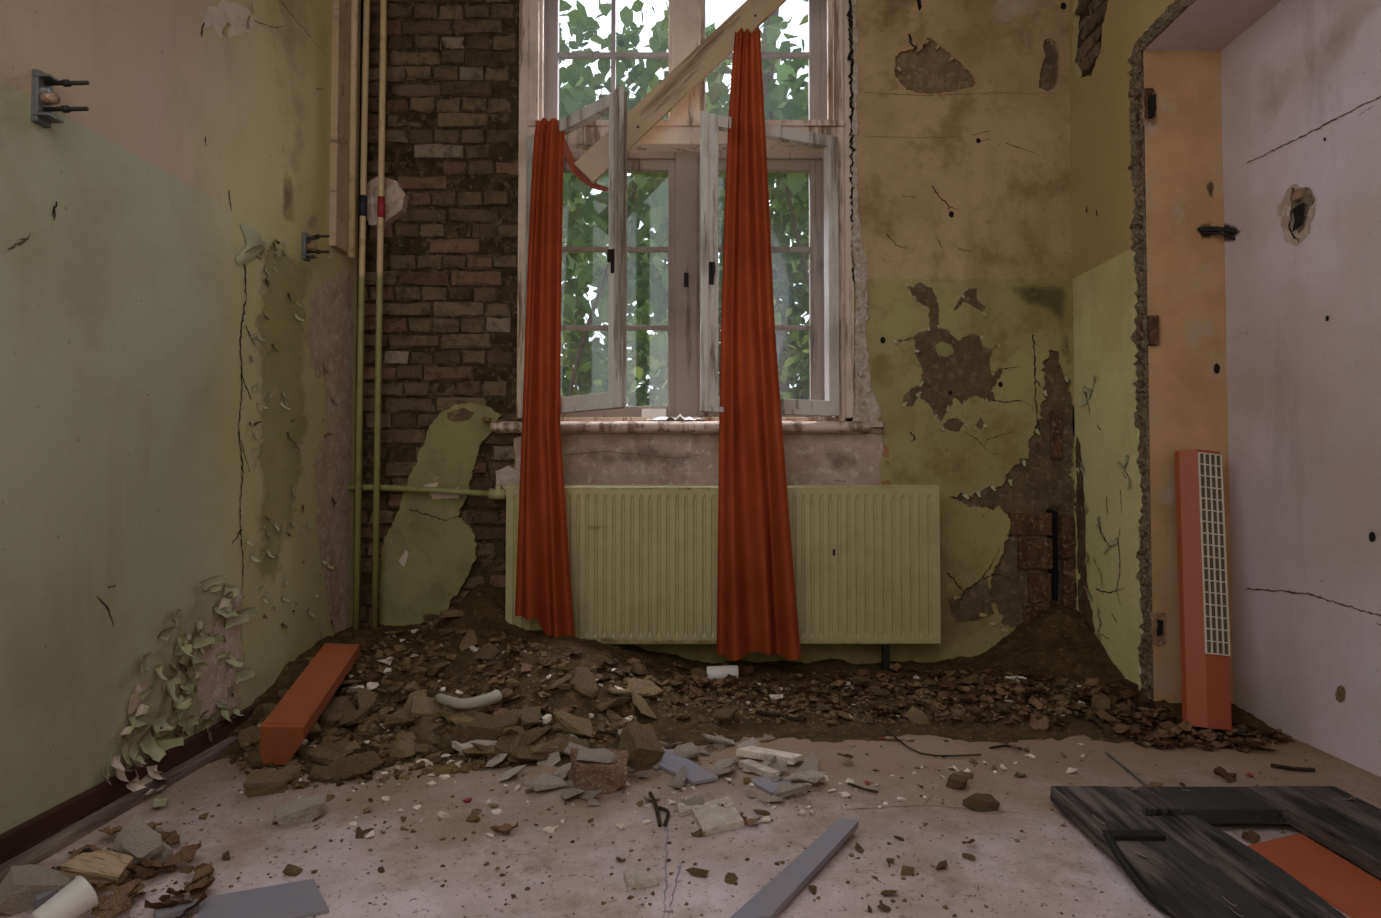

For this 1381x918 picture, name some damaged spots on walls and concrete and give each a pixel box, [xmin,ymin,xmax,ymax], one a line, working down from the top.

spalling [1039,39,1058,91]
flaking render [1061,0,1108,77]
peeling [783,0,1003,485]
spalling [1277,183,1317,246]
spalling [1127,0,1196,701]
flaking render [103,0,522,803]
flaking render [561,433,719,485]
spalling [948,350,1100,640]
crack [1246,588,1381,625]